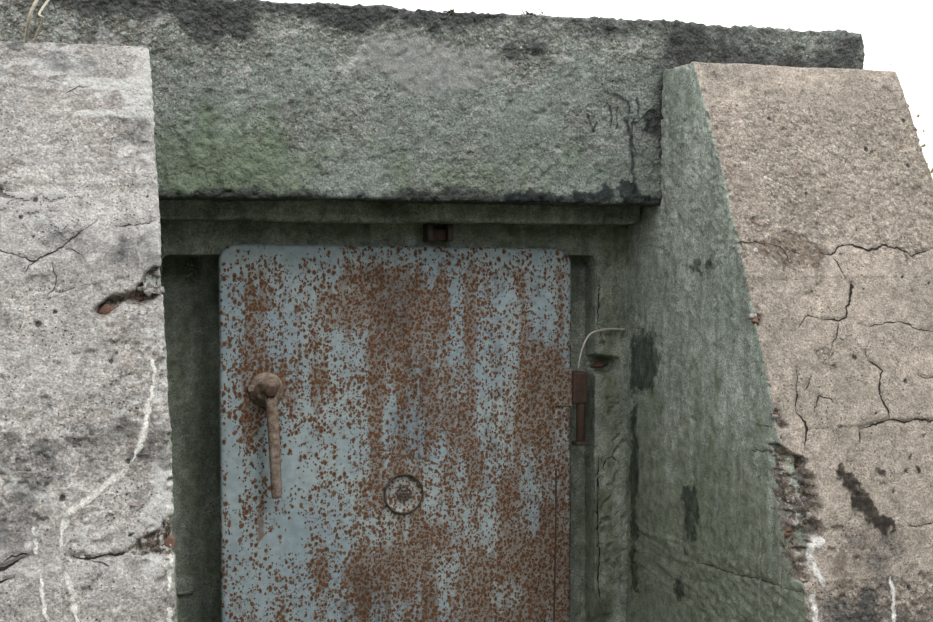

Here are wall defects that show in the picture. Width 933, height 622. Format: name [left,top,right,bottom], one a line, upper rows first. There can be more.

damp [506,90,662,205]
crack [0,219,98,296]
spalling [97,267,165,315]
crack [741,241,933,351]
damp [59,359,157,548]
crack [795,372,837,452]
crack [859,351,933,438]
crack [0,553,29,583]
damp [162,505,174,591]
spalling [766,443,822,582]
damp [804,535,826,622]
damp [836,462,896,535]